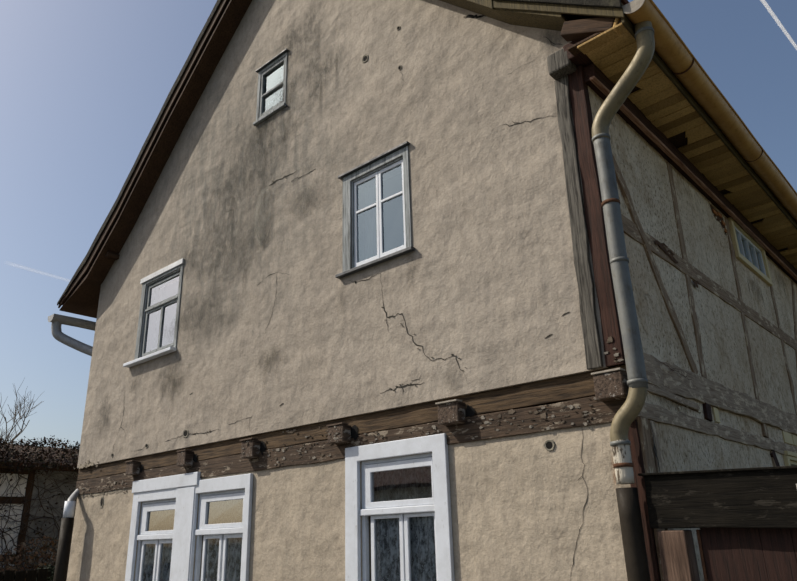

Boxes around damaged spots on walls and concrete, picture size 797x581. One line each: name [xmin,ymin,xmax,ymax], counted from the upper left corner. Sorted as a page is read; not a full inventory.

crack [269,169,315,186]
crack [351,273,467,394]
peeling [467,397,596,439]
crack [570,431,588,581]